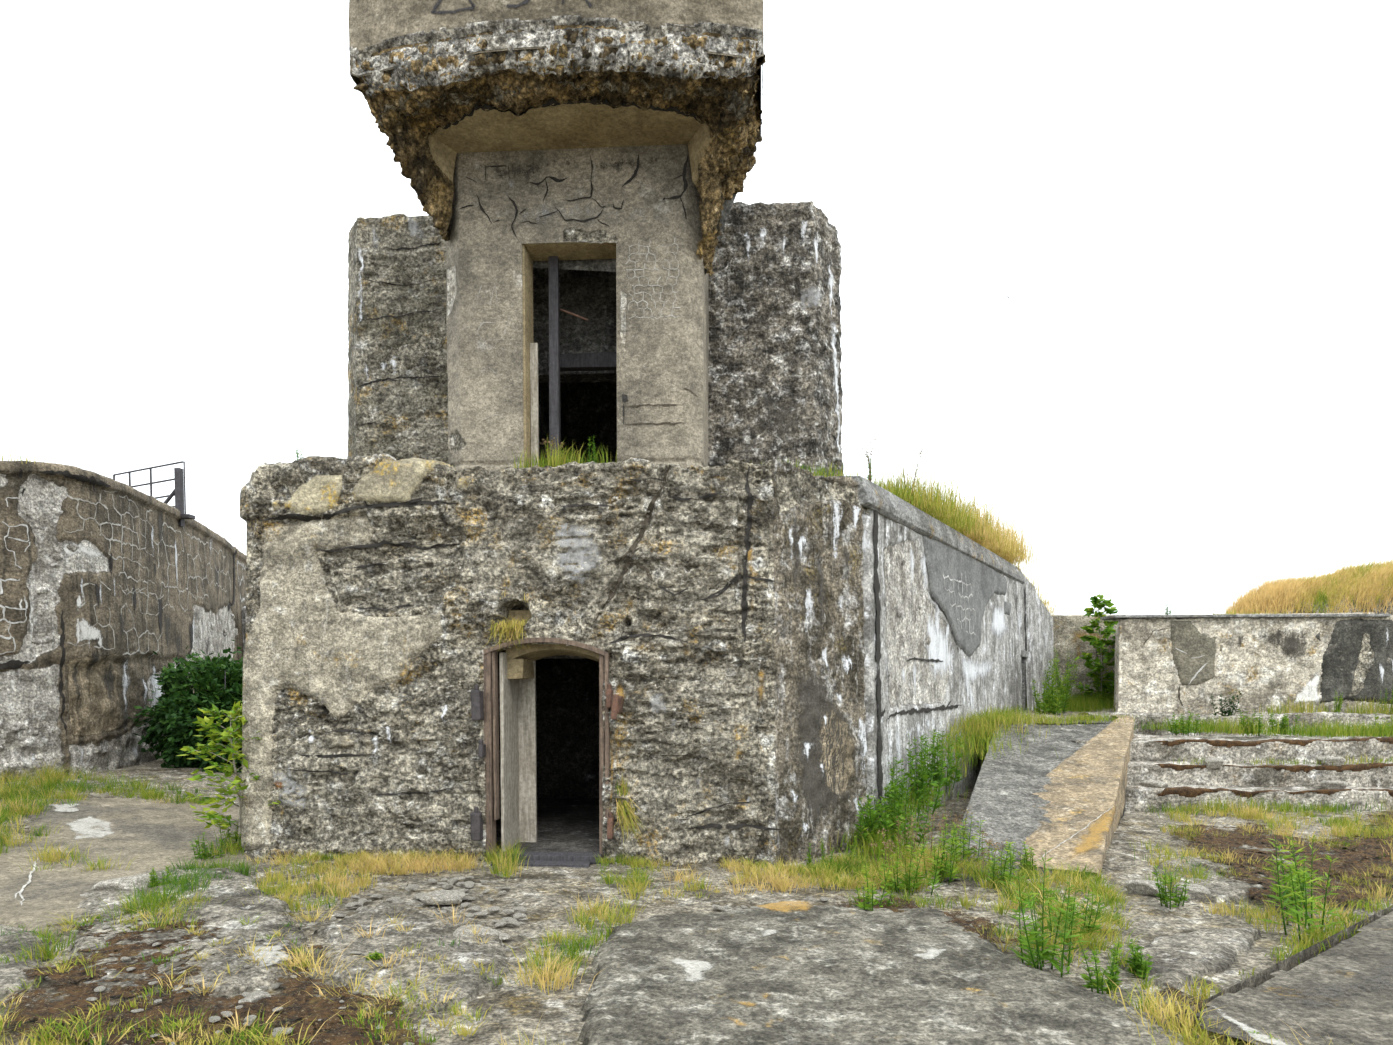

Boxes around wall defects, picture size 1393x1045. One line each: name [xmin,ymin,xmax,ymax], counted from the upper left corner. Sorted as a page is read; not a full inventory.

spalling [349,15,764,134]
crack [431,97,703,135]
crack [388,241,442,251]
crack [460,154,688,319]
spalling [563,227,618,244]
crack [360,279,438,320]
crack [358,376,441,387]
peeling [0,431,762,858]